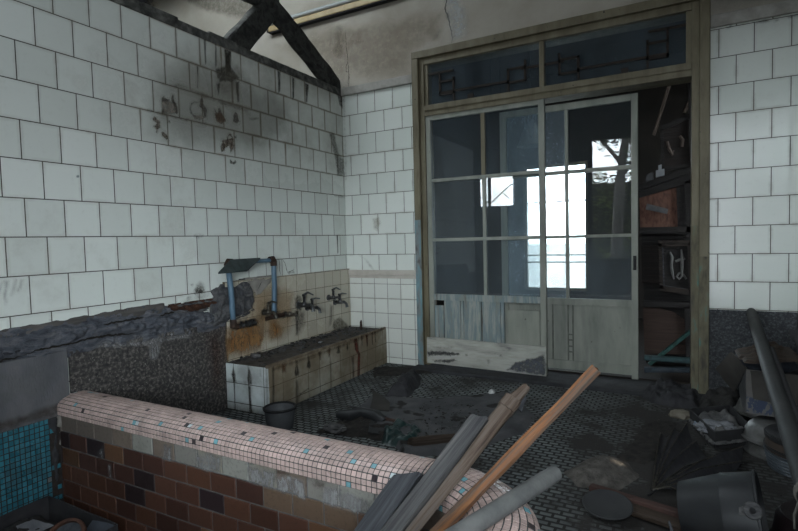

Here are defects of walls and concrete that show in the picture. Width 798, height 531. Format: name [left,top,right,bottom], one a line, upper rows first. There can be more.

flaking render [0,298,226,363]
corrosion [227,291,291,354]